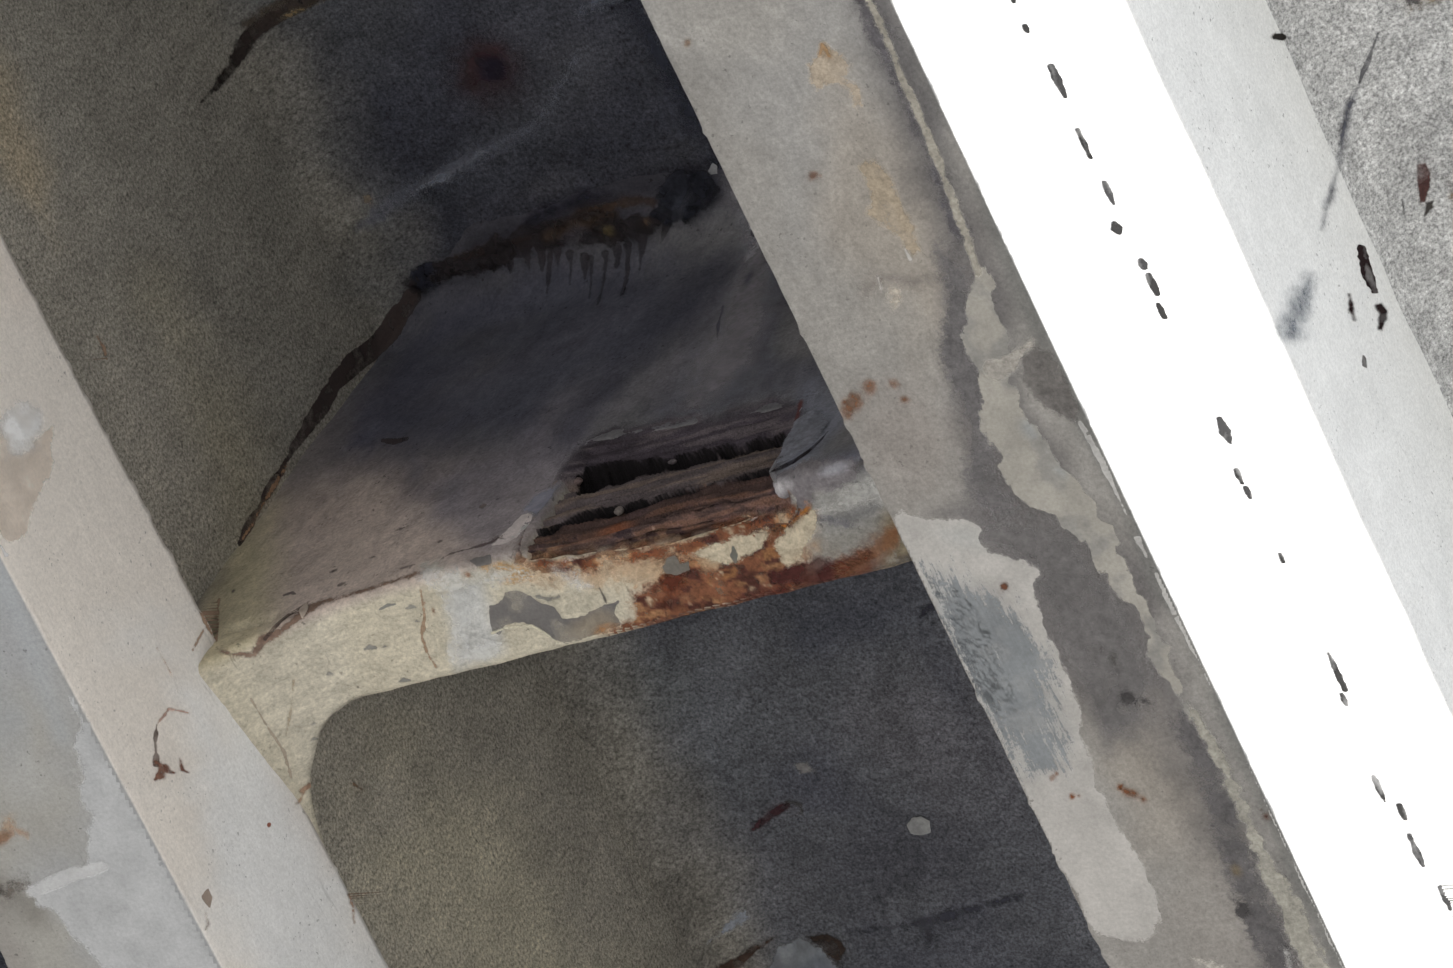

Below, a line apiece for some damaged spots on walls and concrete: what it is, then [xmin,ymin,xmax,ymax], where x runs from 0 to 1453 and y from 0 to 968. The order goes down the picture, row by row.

leakage [237,0,738,546]
leakage [685,225,766,410]
crack [381,437,409,445]
spalling [470,390,827,575]
peeling [489,588,620,643]
corrosion [467,505,911,636]
peeling [202,889,212,908]